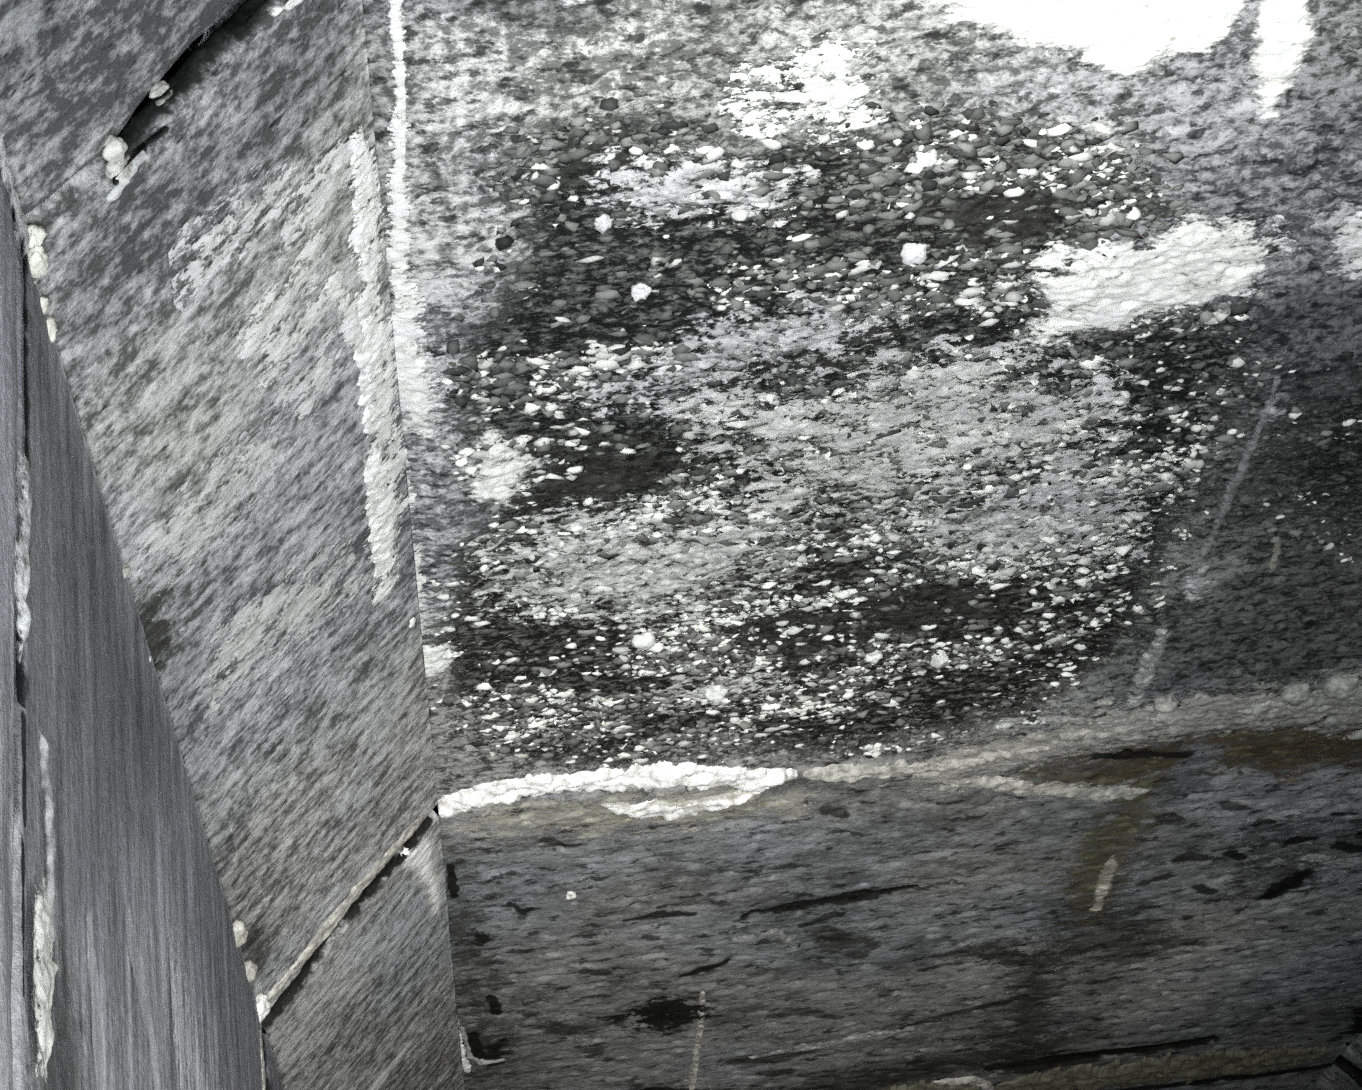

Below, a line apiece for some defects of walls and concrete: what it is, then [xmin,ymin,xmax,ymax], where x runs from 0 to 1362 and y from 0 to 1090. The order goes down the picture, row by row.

crack [107,0,302,201]
leakage [718,28,890,145]
leakage [1081,122,1125,135]
leakage [929,0,1316,119]
leakage [1263,398,1286,422]
peeling [14,453,32,662]
leakage [1183,564,1217,600]
leakage [1127,629,1167,708]
peeling [32,877,58,1077]
leakage [638,991,706,1090]